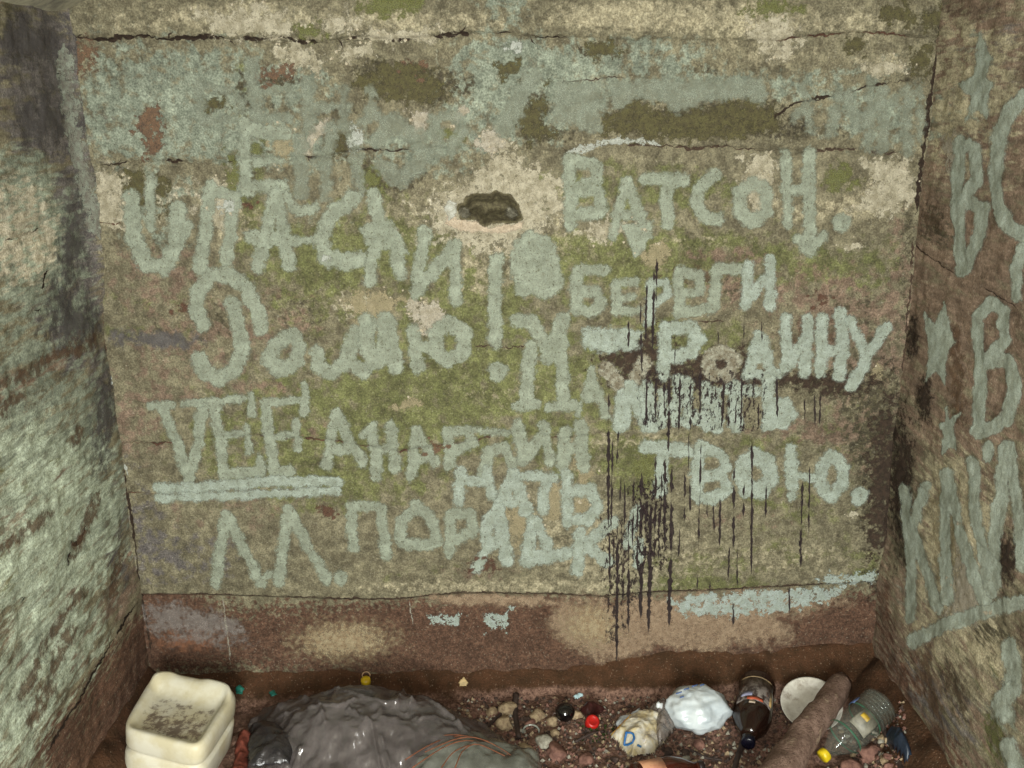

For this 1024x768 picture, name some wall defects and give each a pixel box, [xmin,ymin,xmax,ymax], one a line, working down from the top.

crack [76,26,569,47]
rust [129,100,167,163]
spalling [425,126,566,258]
crack [621,27,939,215]
crack [901,240,956,371]
water stain [585,259,935,661]